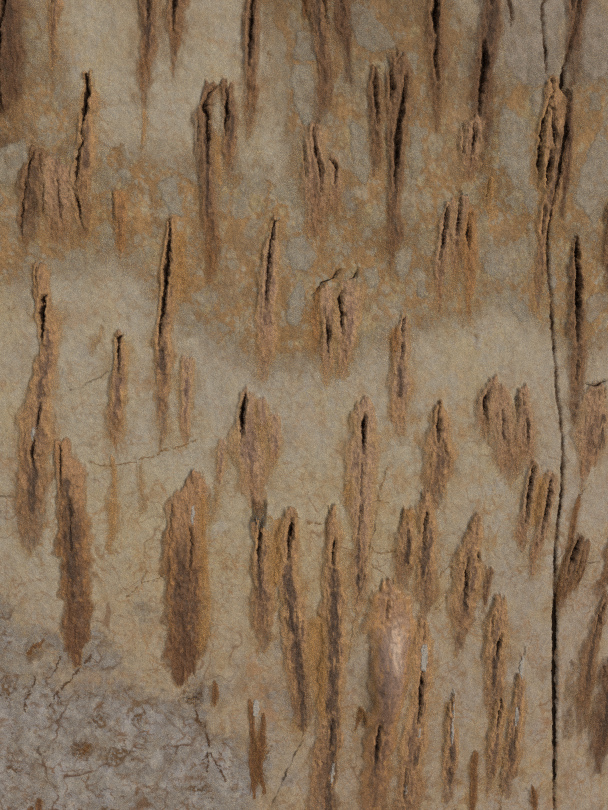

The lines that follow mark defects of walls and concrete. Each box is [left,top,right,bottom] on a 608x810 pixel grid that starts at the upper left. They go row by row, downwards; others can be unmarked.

corrosion [194,0,261,281]
corrosion [433,195,478,314]
corrosion [457,0,503,177]
corrosion [532,75,574,312]
corrosion [14,262,94,668]
corrosion [475,375,558,578]
crack [541,1,575,805]
crack [49,654,92,707]
leakage [0,612,272,810]
crack [191,702,226,782]
corrosion [162,386,459,810]
corrosion [441,513,528,810]